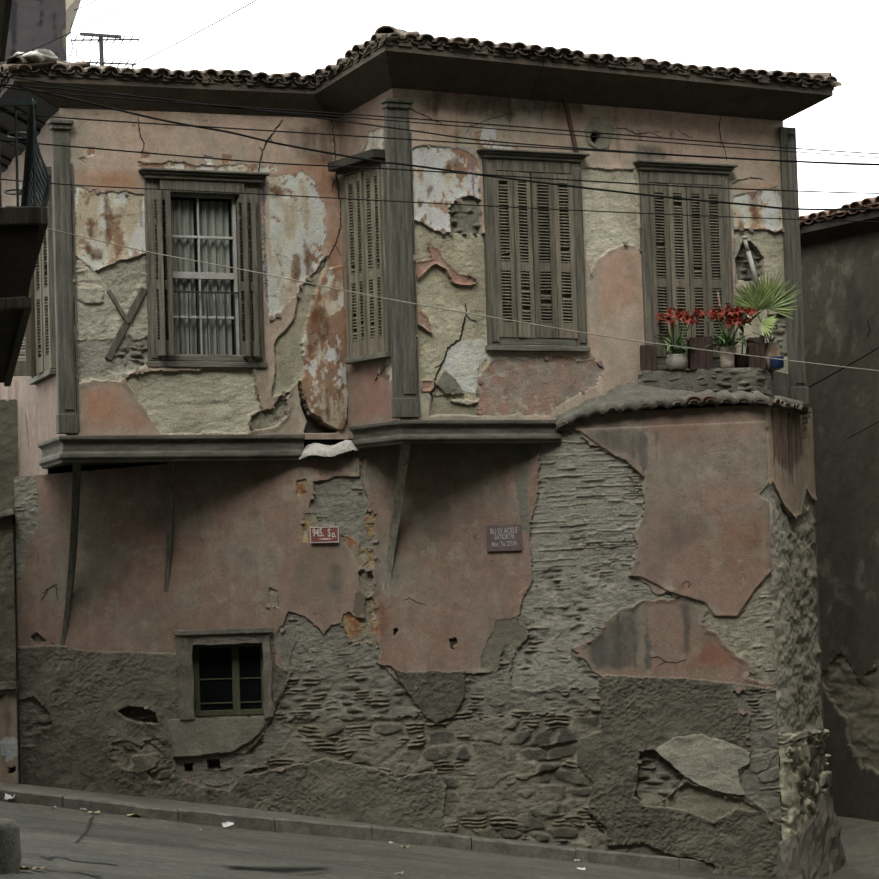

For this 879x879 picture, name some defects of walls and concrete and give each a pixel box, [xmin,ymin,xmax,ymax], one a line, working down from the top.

flaking render [71,151,339,434]
crack [431,303,477,402]
flaking render [412,125,605,416]
crack [615,127,693,138]
flaking render [110,425,716,873]
flaking render [634,482,879,840]